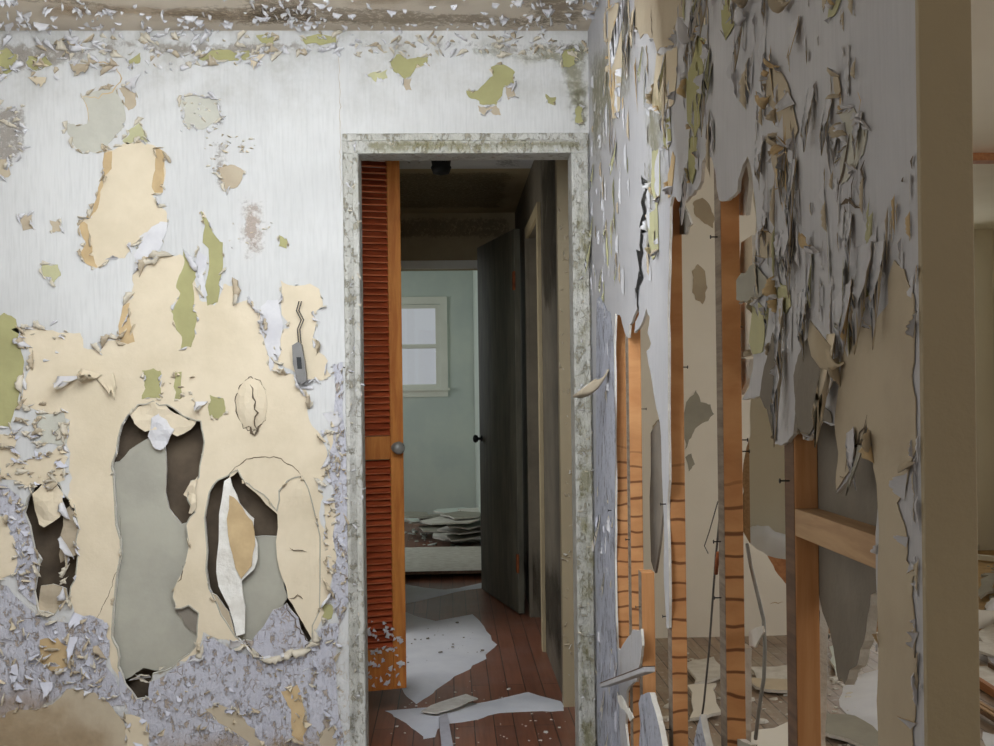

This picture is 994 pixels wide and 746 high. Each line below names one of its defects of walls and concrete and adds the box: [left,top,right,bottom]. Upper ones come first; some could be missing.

peeling [0,0,714,746]
peeling [720,0,922,746]